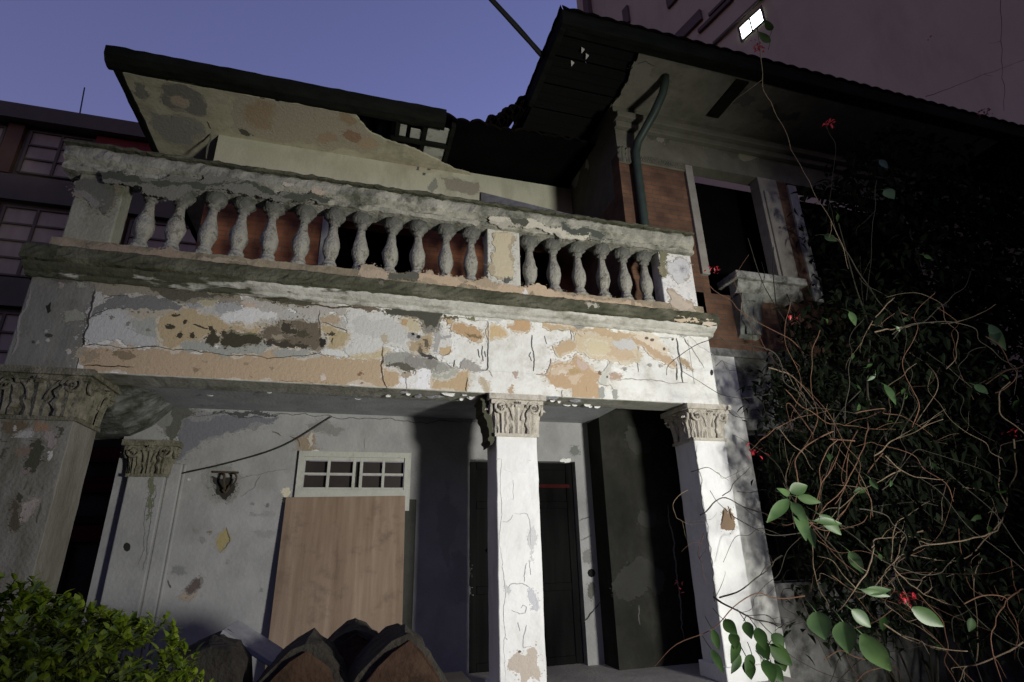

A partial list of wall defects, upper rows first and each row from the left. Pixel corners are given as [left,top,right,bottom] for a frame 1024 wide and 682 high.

peeling [231,94,380,153]
peeling [58,281,489,401]
peeling [442,318,694,408]
crack [637,336,714,382]
crack [180,412,476,447]
peeling [18,497,39,523]
spalling [720,507,738,534]
crack [502,483,531,648]
peeling [504,641,545,682]